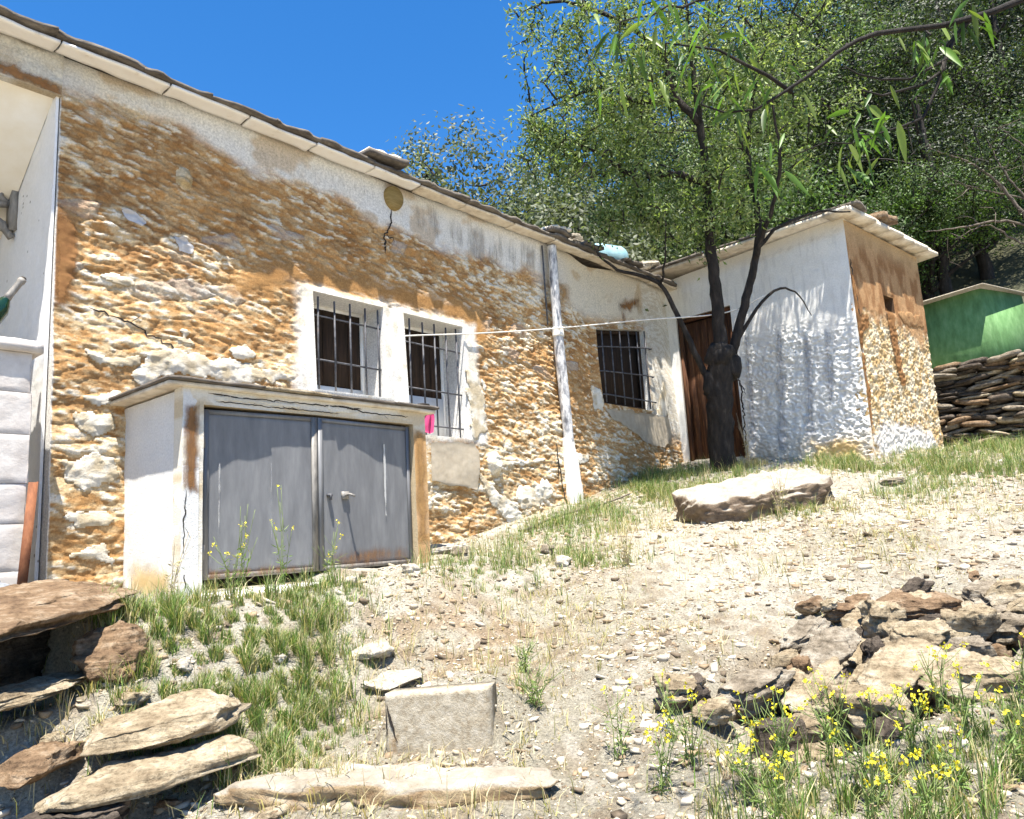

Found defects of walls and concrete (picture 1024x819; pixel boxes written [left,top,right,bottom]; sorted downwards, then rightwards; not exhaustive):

crack [89,307,174,349]
flaking render [85,329,290,385]
spalling [851,273,874,434]
flaking render [73,390,121,438]
crack [210,393,406,418]
spalling [590,385,604,411]
flaking render [60,452,119,492]
rust [184,406,198,490]
flaking render [63,511,114,528]
flaking render [69,543,115,564]
crack [181,491,189,591]
flaking render [480,474,553,523]